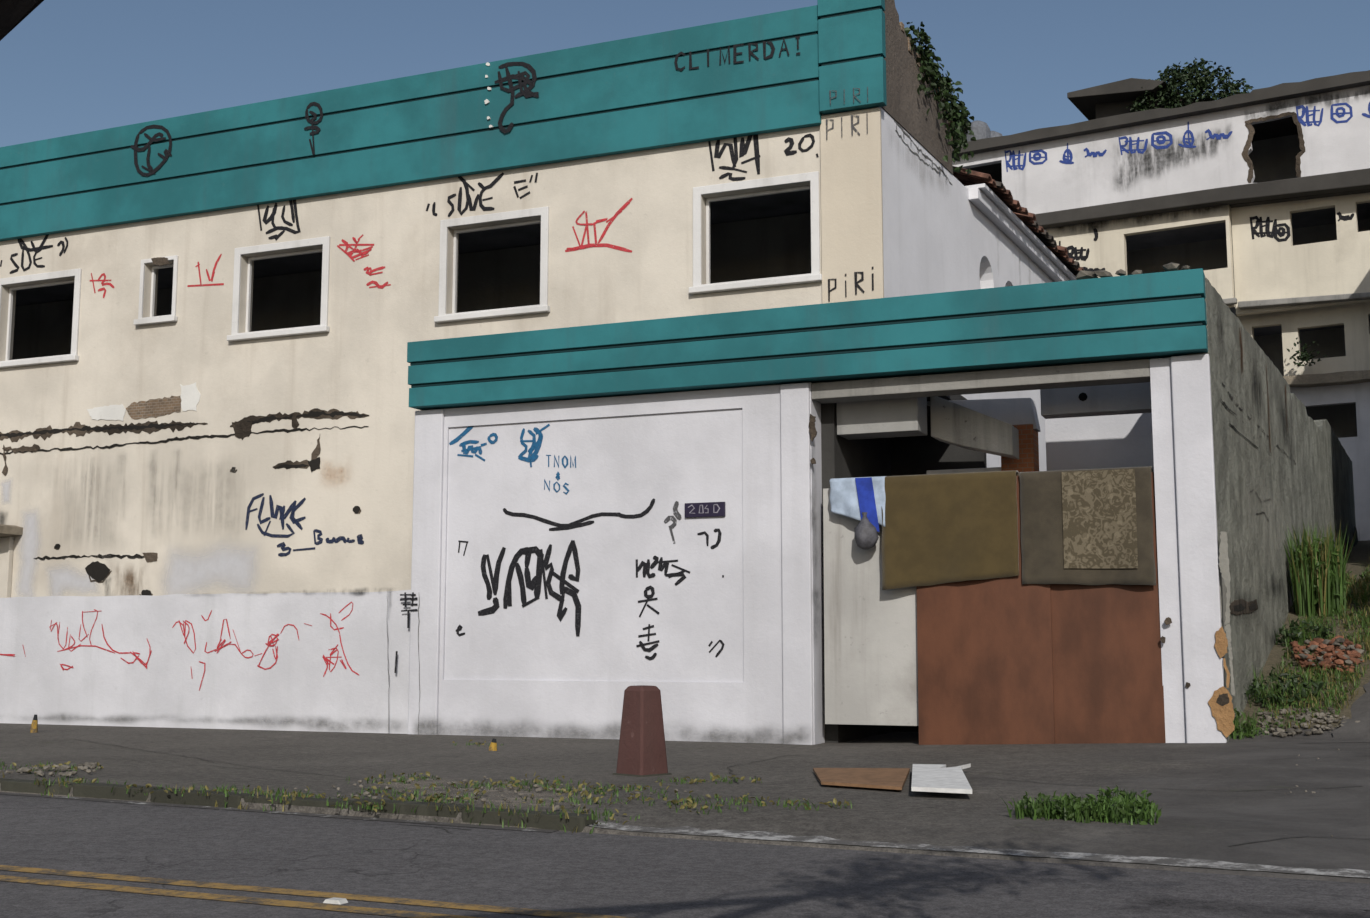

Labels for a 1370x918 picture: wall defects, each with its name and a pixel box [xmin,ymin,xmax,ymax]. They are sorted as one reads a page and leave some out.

water stain [1120,139,1218,183]
spalling [1242,112,1305,183]
spalling [0,382,369,476]
peeling [1208,531,1258,738]